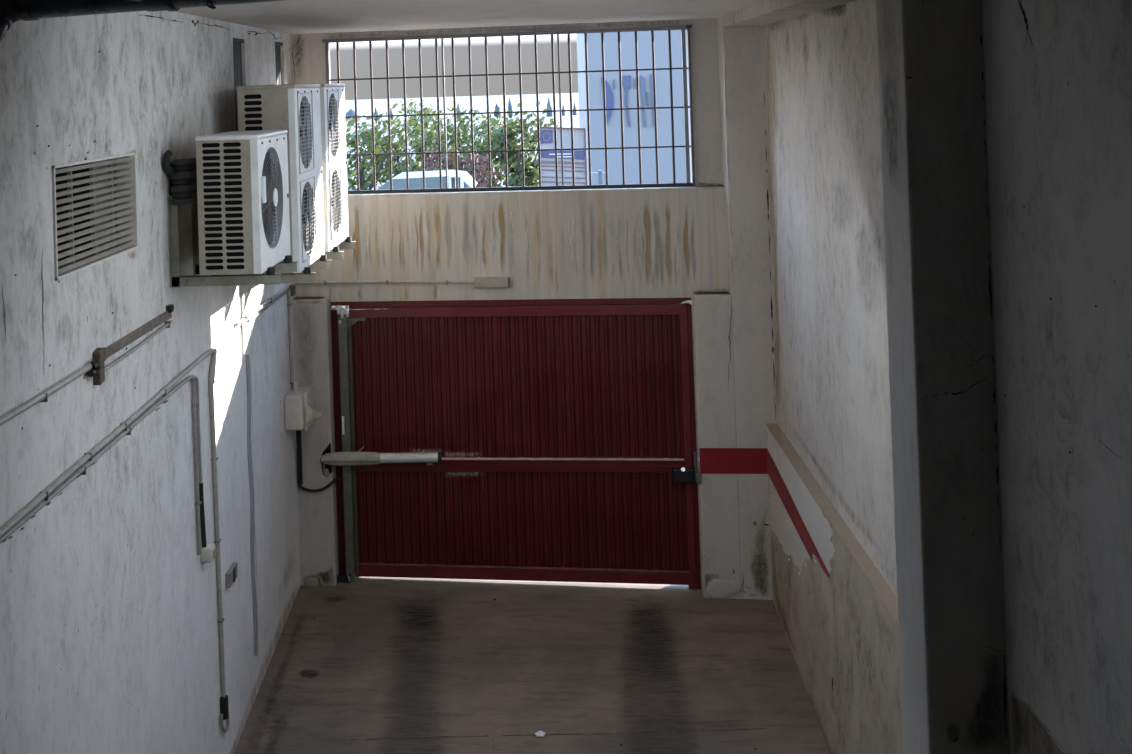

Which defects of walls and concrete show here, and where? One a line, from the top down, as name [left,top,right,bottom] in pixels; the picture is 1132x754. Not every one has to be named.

crack [1018,0,1033,48]
rust [415,214,440,262]
crack [986,257,994,318]
crack [920,355,999,507]
peeling [767,428,836,576]
peeling [1012,694,1063,754]